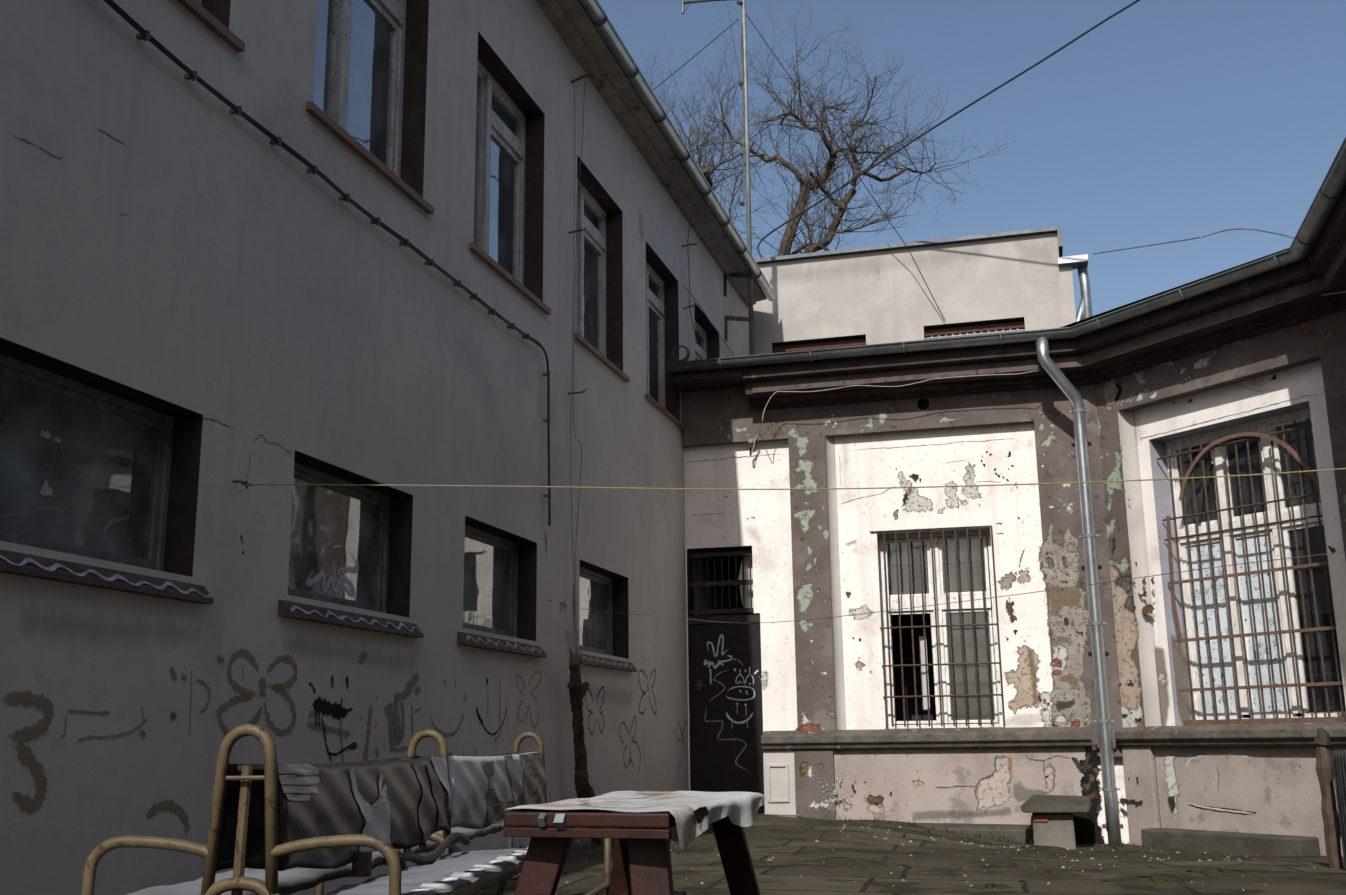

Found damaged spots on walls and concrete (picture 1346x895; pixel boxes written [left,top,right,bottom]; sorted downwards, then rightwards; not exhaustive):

crack [11,134,62,159]
spalling [1097,338,1247,439]
peeling [893,451,1018,520]
peeling [720,412,829,643]
peeling [846,592,873,620]
spalling [998,484,1097,727]
spalling [1101,447,1155,728]
flaking render [1082,744,1100,800]
spalling [1118,777,1143,807]